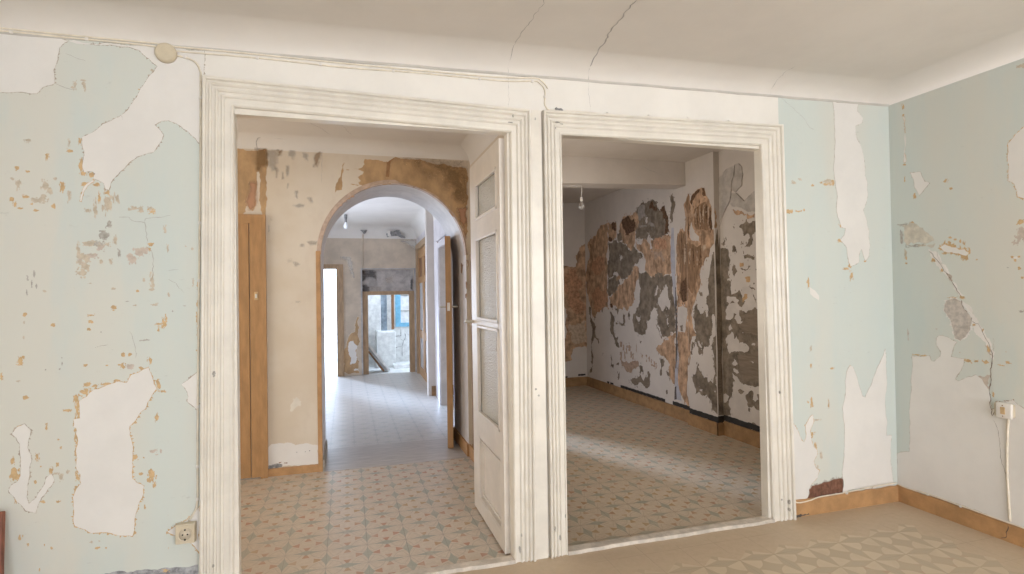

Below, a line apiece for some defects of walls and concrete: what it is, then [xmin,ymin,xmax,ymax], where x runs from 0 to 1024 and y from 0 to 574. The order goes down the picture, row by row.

crack [588,0,637,101]
peeling [8,352,166,549]
peeling [0,34,206,284]
peeling [110,272,198,341]
peeling [237,149,268,215]
peeling [335,157,469,237]
flaking render [564,163,760,426]
peeling [791,102,870,280]
peeling [781,297,1024,527]
peeling [897,221,978,272]
crack [928,249,1006,474]
peeling [1006,127,1024,200]